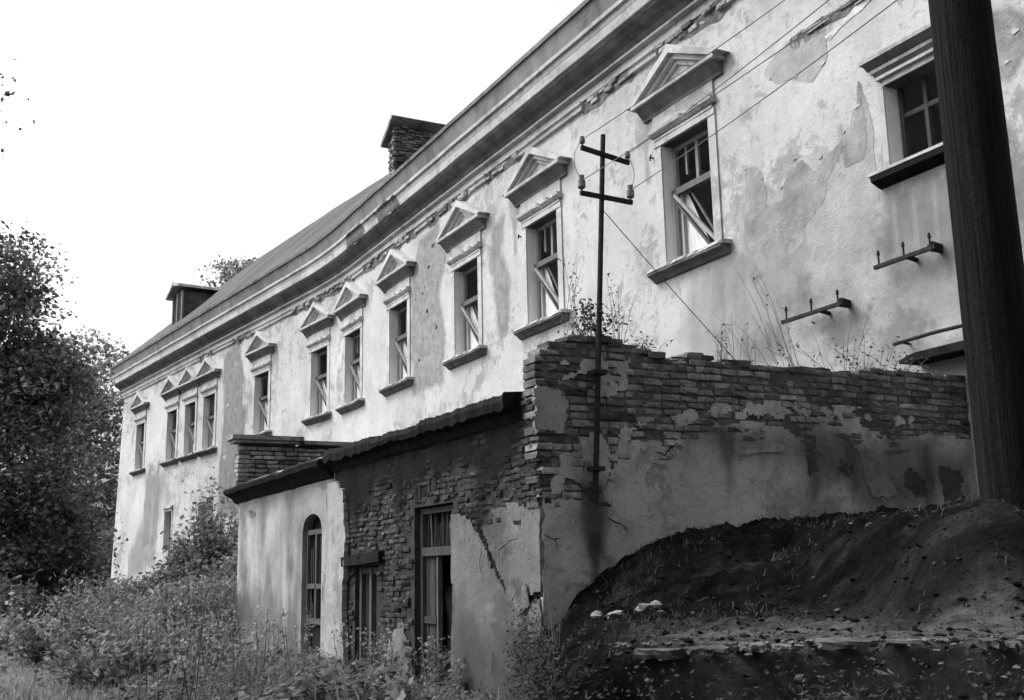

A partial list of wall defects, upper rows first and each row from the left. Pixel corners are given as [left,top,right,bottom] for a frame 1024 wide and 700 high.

spalling [764,0,869,84]
spalling [1011,153,1024,259]
spalling [345,81,973,678]